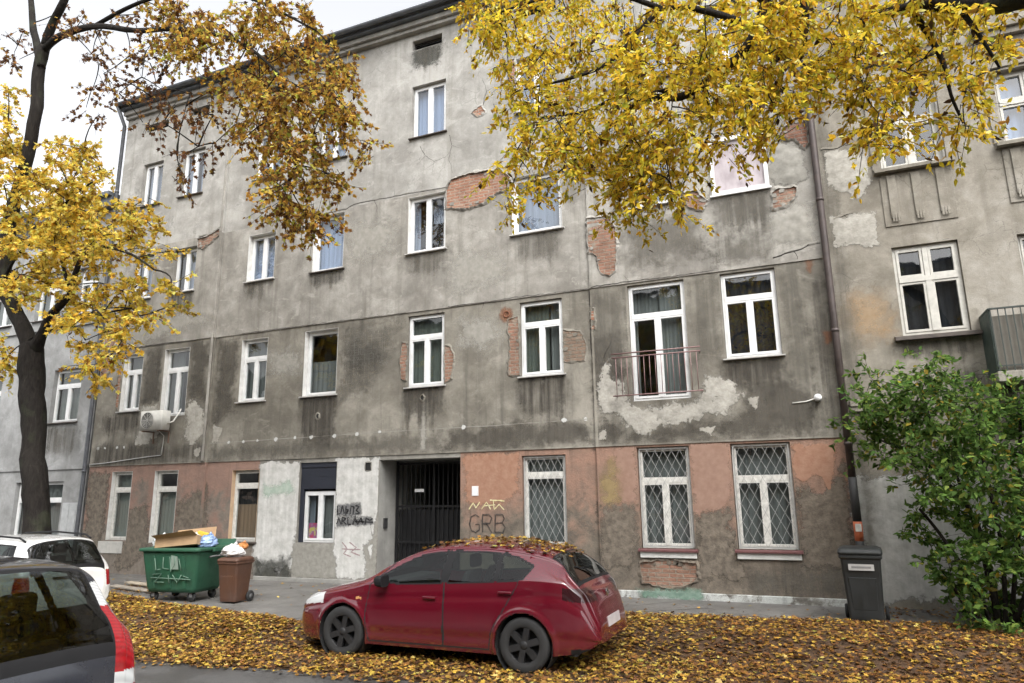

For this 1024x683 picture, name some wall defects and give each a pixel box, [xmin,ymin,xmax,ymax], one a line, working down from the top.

crack [295,135,453,220]
spalling [444,166,512,212]
peeling [823,149,880,249]
spalling [585,215,620,277]
crack [773,241,820,259]
spalling [398,342,408,381]
spalling [443,315,521,383]
leakage [302,398,337,440]
leakage [407,388,438,450]
leakage [520,378,564,412]
peeling [252,460,300,576]
peeling [595,442,752,591]